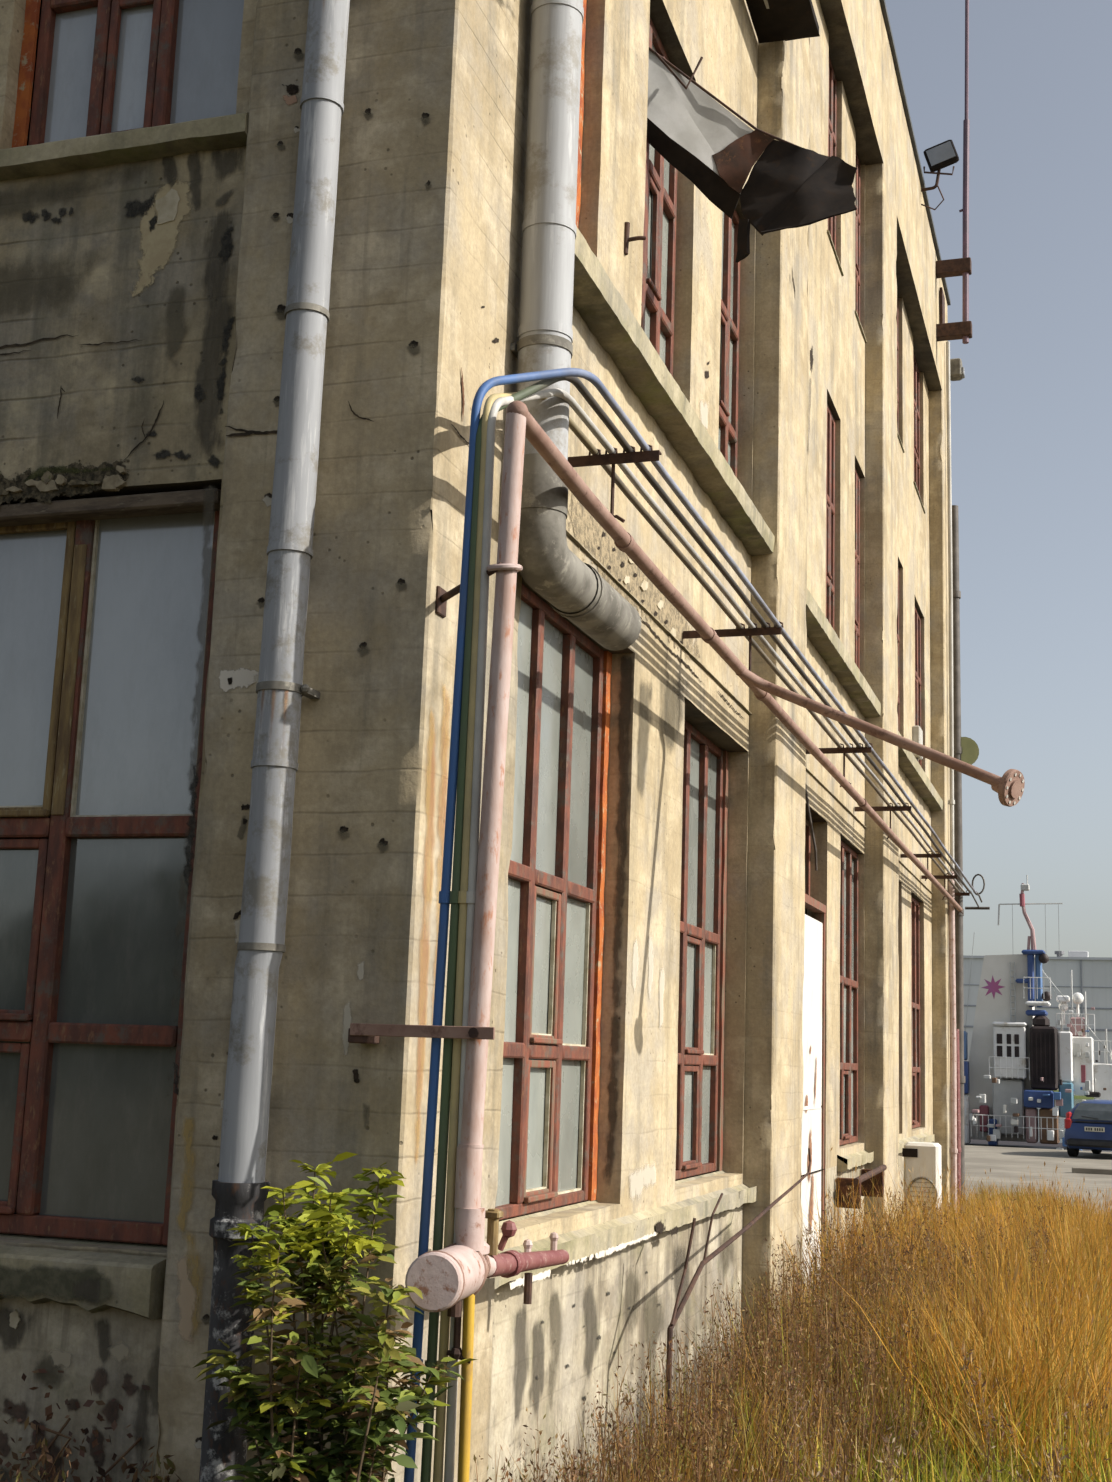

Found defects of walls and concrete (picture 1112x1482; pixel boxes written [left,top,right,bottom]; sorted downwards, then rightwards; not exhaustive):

damp [0,185,81,224]
peeling [132,179,191,297]
crack [0,335,142,355]
damp [124,151,242,468]
spalling [0,459,130,506]
peeling [568,490,700,660]
damp [175,486,215,937]
damp [0,1266,111,1362]
damp [515,1248,689,1419]